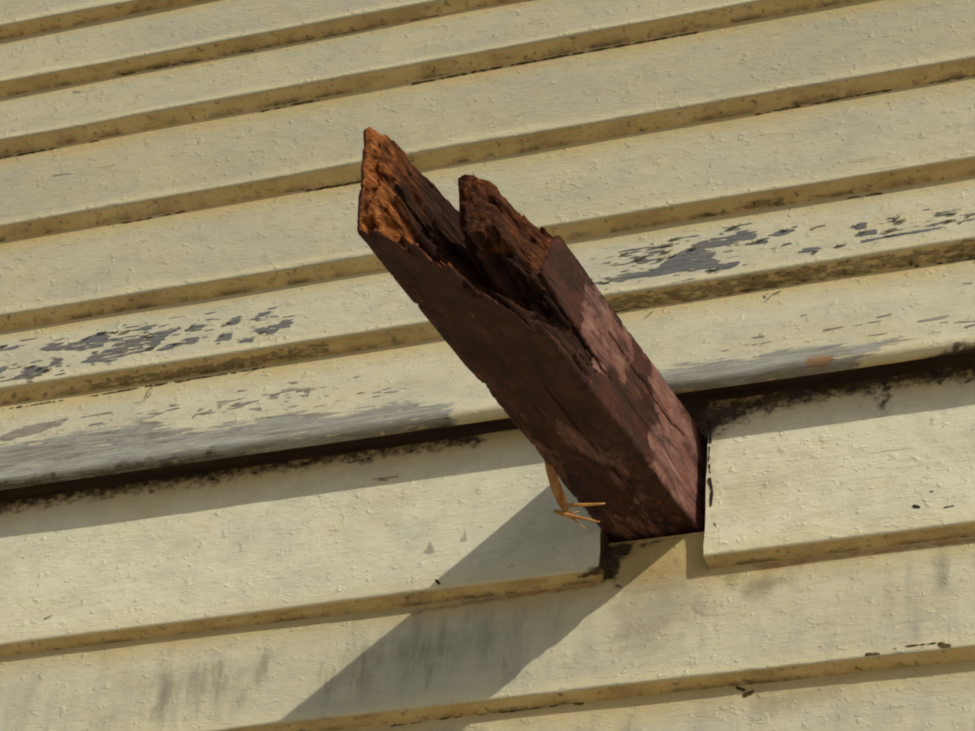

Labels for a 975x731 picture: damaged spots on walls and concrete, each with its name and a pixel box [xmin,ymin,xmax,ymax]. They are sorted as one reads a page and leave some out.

peeling [591,223,846,284]
peeling [852,209,975,243]
peeling [0,307,294,382]
peeling [658,313,917,390]
peeling [0,381,458,490]
damp [691,364,975,439]
damp [0,435,481,514]